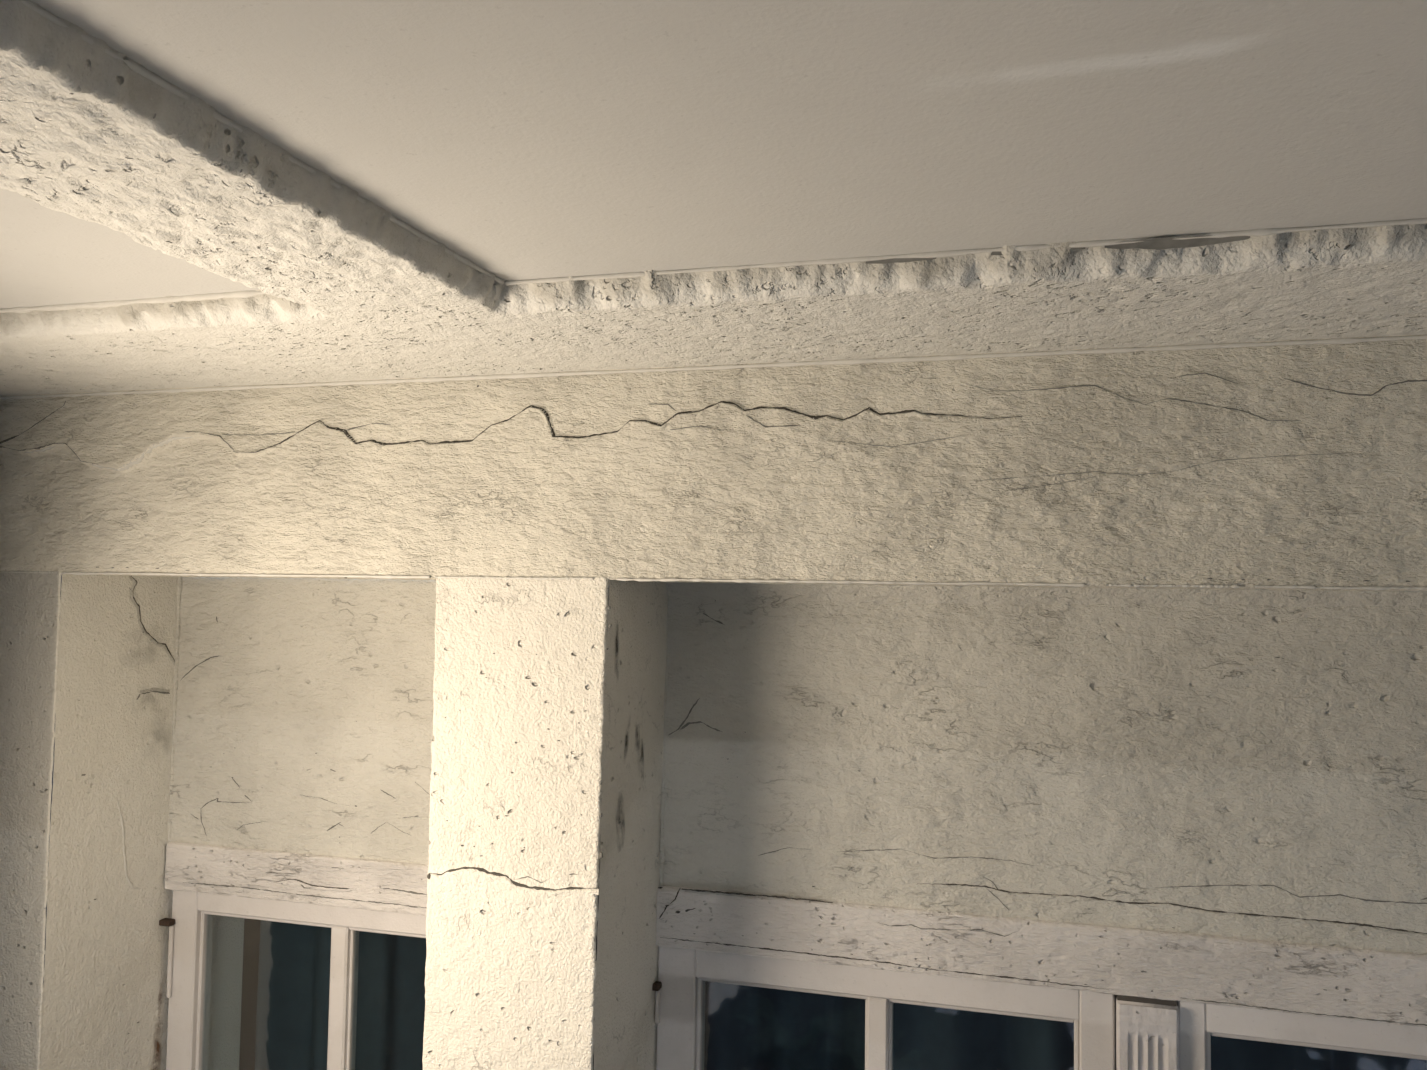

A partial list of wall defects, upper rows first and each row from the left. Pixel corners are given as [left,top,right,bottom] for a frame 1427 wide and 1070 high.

crack [222,373,1300,458]
crack [1284,378,1427,396]
crack [976,453,1343,490]
crack [128,576,218,699]
crack [183,867,599,908]
crack [758,847,1427,938]
crack [658,887,1108,990]